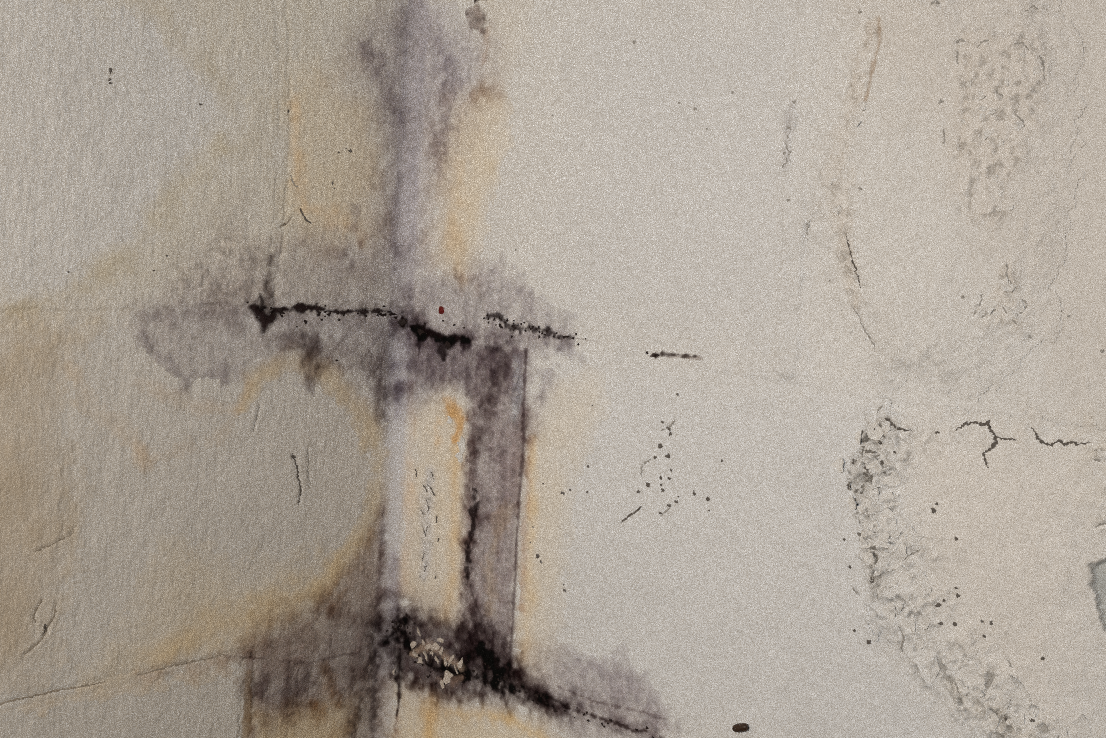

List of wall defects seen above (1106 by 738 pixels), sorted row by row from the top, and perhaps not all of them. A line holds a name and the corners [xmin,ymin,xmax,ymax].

corrosion [287,70,376,244]
leakage [0,0,685,738]
corrosion [399,388,467,622]
leakage [646,349,703,361]
spalling [831,395,1092,738]
crack [956,420,1089,468]
spalling [1095,562,1106,621]